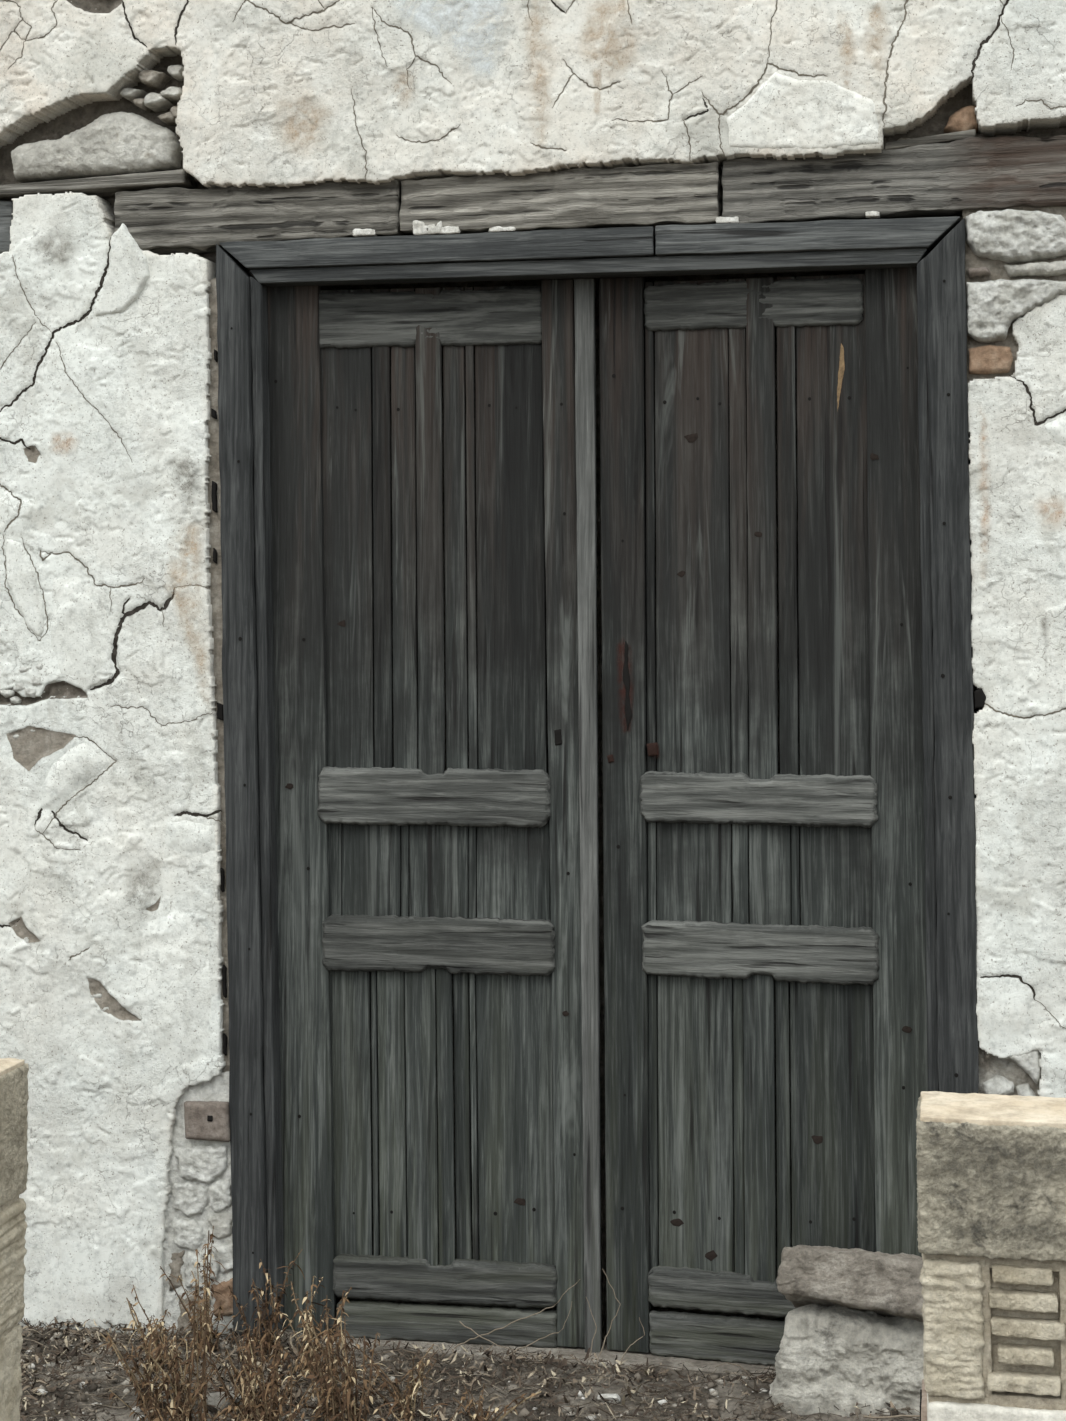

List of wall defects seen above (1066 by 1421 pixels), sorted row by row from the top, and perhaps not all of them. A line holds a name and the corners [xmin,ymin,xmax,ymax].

spalling [0,54,198,202]
crack [233,0,452,89]
crack [552,0,826,160]
crack [970,0,1066,109]
crack [0,237,132,461]
spalling [963,206,1066,383]
crack [1009,375,1066,426]
crack [0,484,214,726]
spalling [7,726,76,771]
spalling [0,664,88,706]
spalling [163,278,233,1336]
spalling [978,1041,1041,1096]